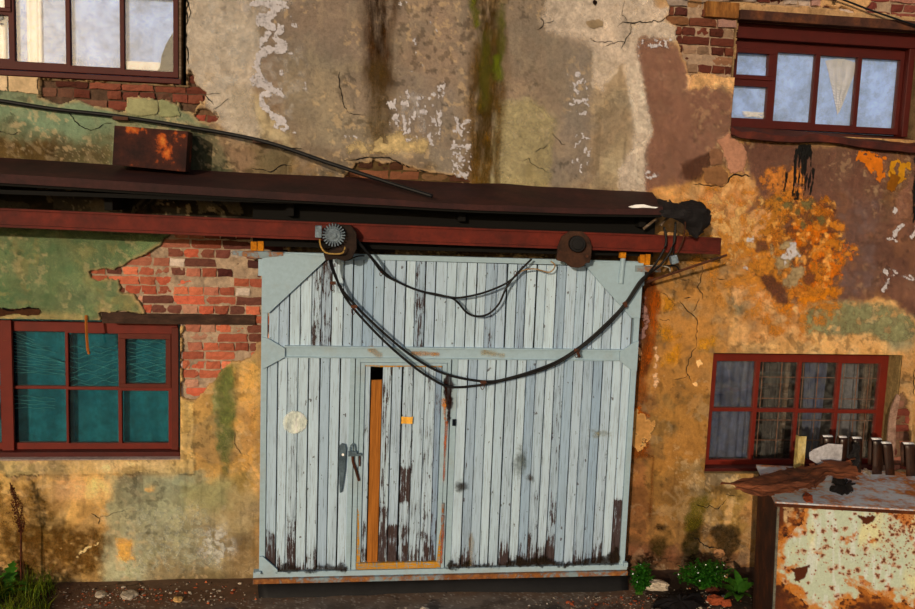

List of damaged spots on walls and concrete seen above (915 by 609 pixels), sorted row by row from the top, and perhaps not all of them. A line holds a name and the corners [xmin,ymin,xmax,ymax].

flaking render [0,71,219,123]
leakage [249,0,298,134]
leakage [366,0,446,146]
leakage [450,0,504,184]
crack [593,4,666,47]
peeling [545,0,854,191]
flaking render [866,0,915,17]
flaking render [91,234,288,399]
crack [660,258,724,380]
leakage [881,268,914,293]
leakage [887,223,915,242]
leakage [0,486,105,578]